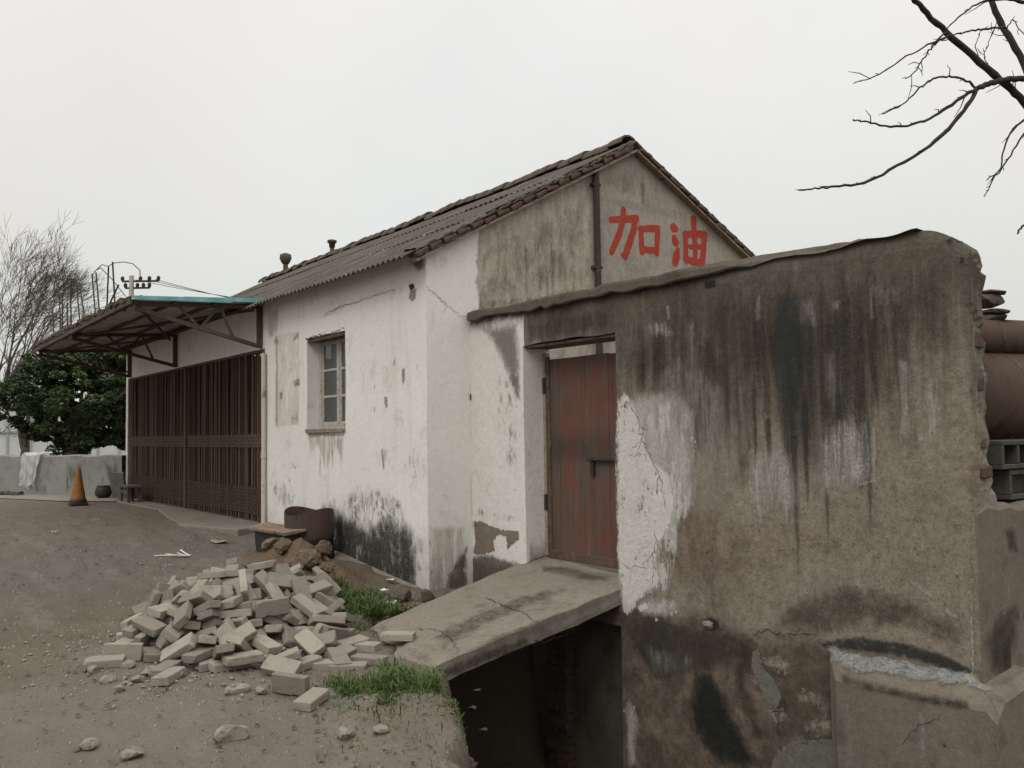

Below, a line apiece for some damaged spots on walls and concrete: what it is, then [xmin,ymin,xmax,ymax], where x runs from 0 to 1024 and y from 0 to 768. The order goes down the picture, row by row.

crack [306,290,395,341]
leakage [491,327,519,395]
crack [626,401,665,500]
leakage [641,287,877,525]
leakage [334,495,415,584]
peeling [449,511,519,588]
leakage [634,616,760,767]